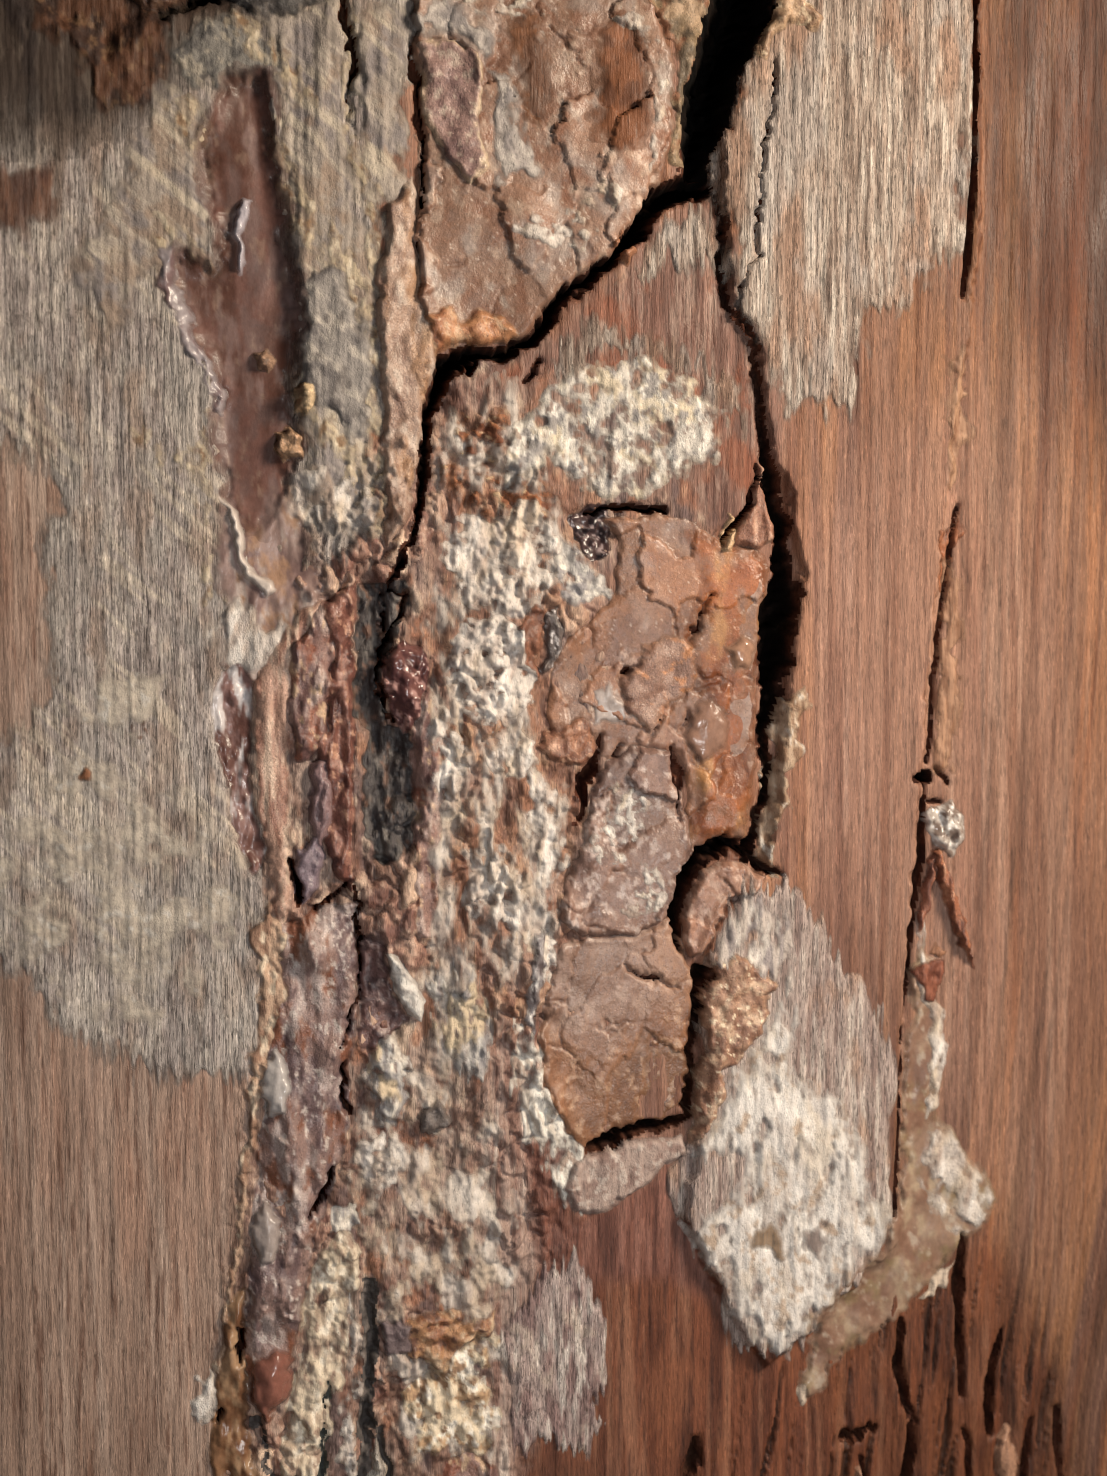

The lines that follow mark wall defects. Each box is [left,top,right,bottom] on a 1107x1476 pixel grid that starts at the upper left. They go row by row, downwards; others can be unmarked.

crack [760,74,776,155]
crack [373,174,807,1154]
spalling [211,663,266,874]
peeling [287,760,332,908]
spalling [572,734,618,826]
crack [892,506,958,1217]
leakage [911,916,947,1113]
peeling [419,1100,452,1134]
peeling [442,1452,499,1476]